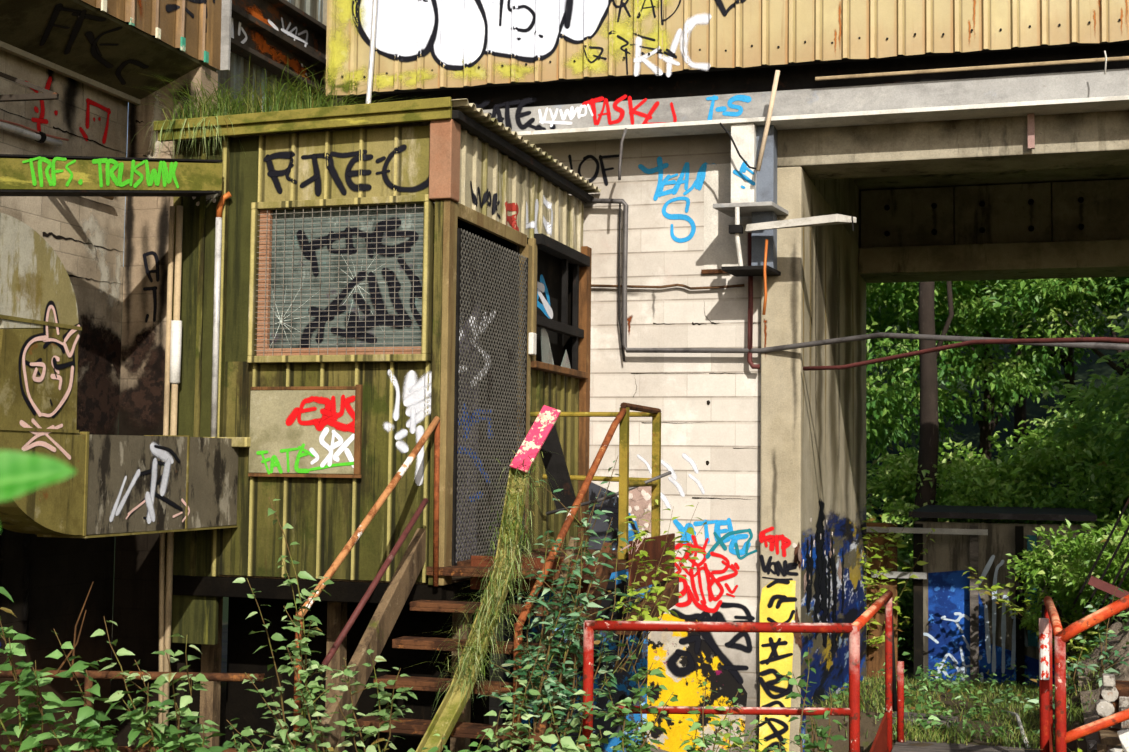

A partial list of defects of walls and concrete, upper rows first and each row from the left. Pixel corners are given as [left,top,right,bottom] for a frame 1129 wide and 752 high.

damp [48,69,79,133]
damp [128,84,195,158]
damp [76,197,169,435]